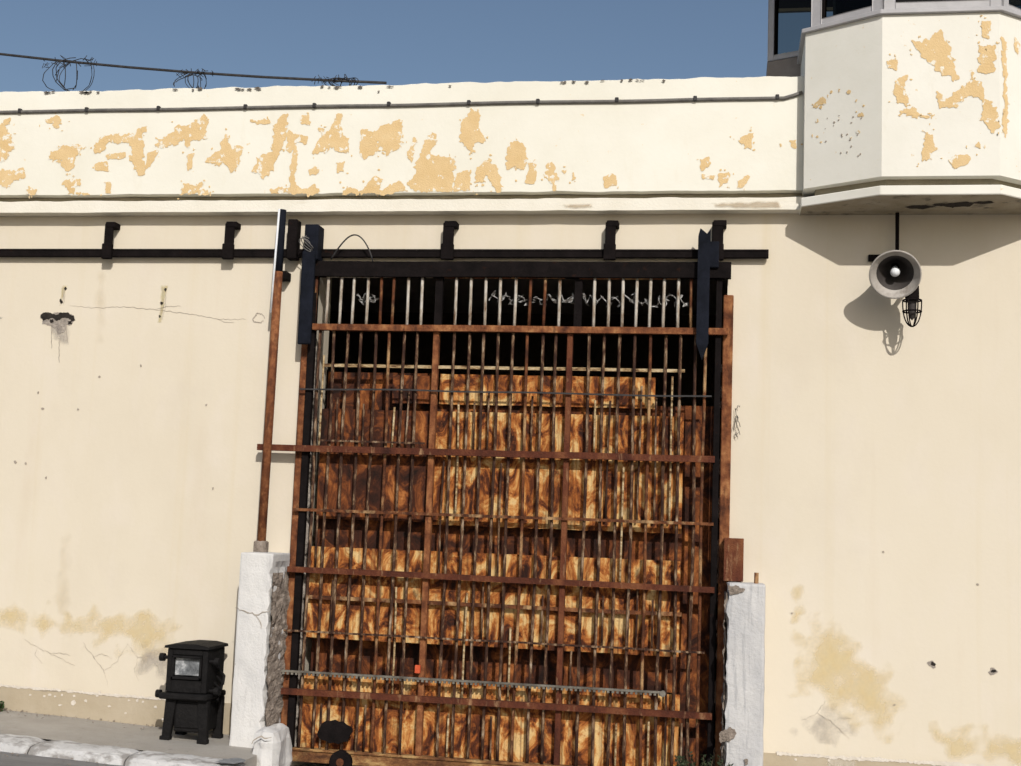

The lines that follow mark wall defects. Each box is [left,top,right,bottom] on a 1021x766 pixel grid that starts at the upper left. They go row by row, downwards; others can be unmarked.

peeling [886,15,1020,169]
peeling [0,118,37,199]
peeling [39,113,70,131]
peeling [48,105,576,199]
peeling [603,173,619,189]
peeling [697,157,750,190]
peeling [730,127,755,151]
peeling [779,89,865,157]
flaking render [40,312,75,362]
crack [27,641,162,700]